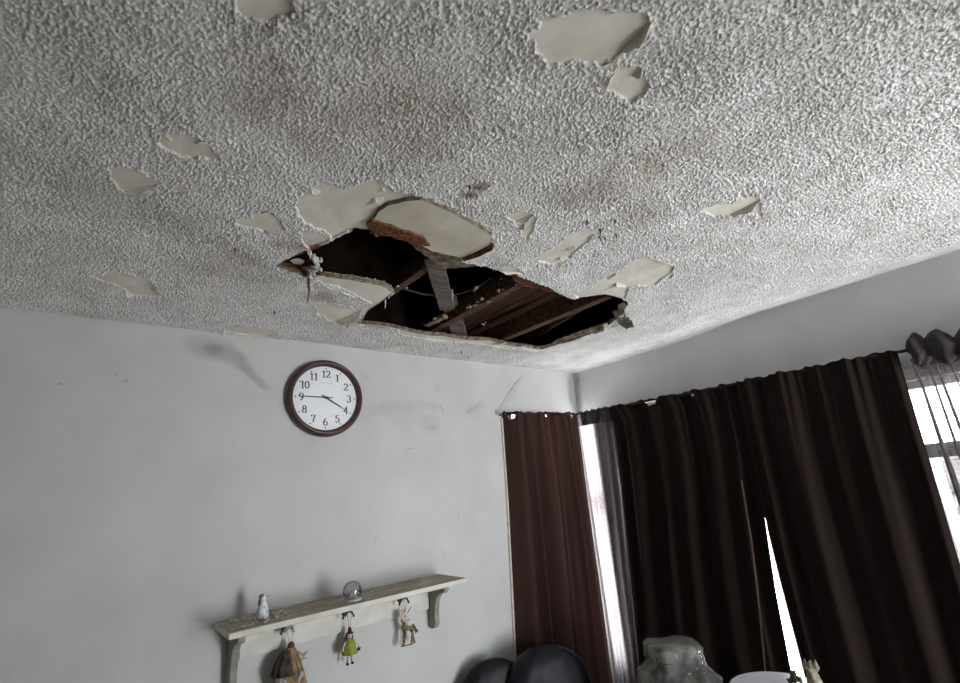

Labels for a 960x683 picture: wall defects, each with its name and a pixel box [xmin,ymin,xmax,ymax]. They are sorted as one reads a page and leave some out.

peeling [529,7,653,100]
peeling [296,178,413,246]
peeling [507,211,536,240]
peeling [699,193,762,222]
peeling [501,266,522,275]
peeling [576,258,674,298]
peeling [316,276,392,328]
peeling [399,330,545,359]